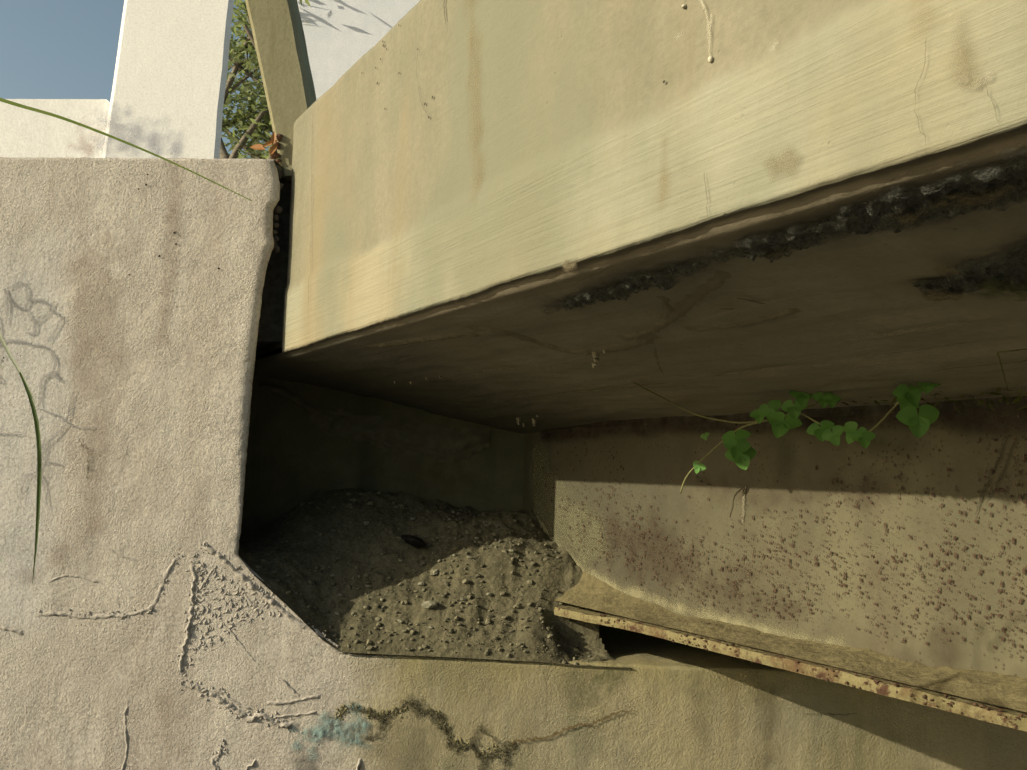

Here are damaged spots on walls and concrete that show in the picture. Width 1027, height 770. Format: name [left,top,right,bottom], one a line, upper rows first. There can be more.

spalling [562,157,1027,311]
crack [0,282,97,505]
rust [532,414,1027,658]
crack [329,699,636,770]